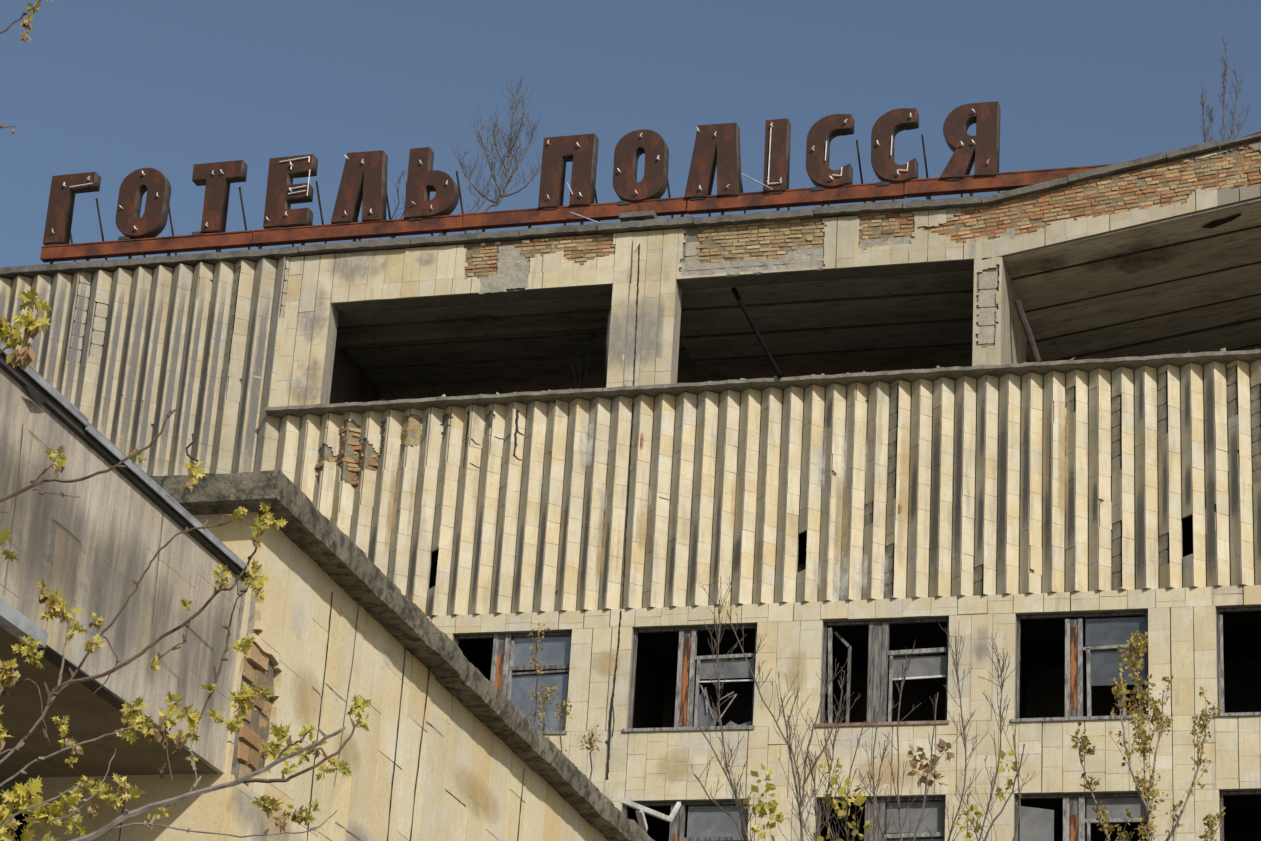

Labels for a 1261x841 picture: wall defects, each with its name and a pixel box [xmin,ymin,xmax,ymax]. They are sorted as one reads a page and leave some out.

spalling [465,234,616,294]
spalling [680,217,827,276]
spalling [858,146,1261,250]
spalling [314,420,386,487]
spalling [399,415,421,461]
leakage [581,501,609,600]
leakage [930,436,939,565]
leakage [954,418,962,550]
leakage [998,430,1006,558]
leakage [1045,432,1074,557]
leakage [1207,478,1215,566]
spalling [232,573,276,786]